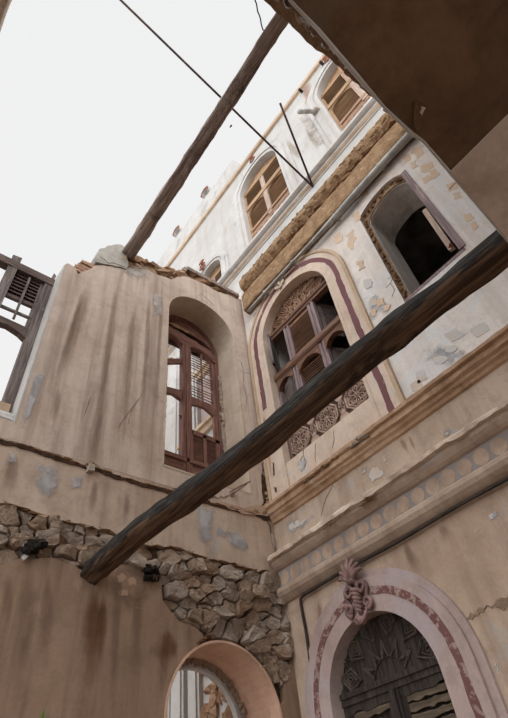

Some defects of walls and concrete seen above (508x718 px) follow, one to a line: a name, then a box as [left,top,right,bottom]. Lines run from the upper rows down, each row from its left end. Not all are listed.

peeling [402,145,440,183]
peeling [432,322,490,364]